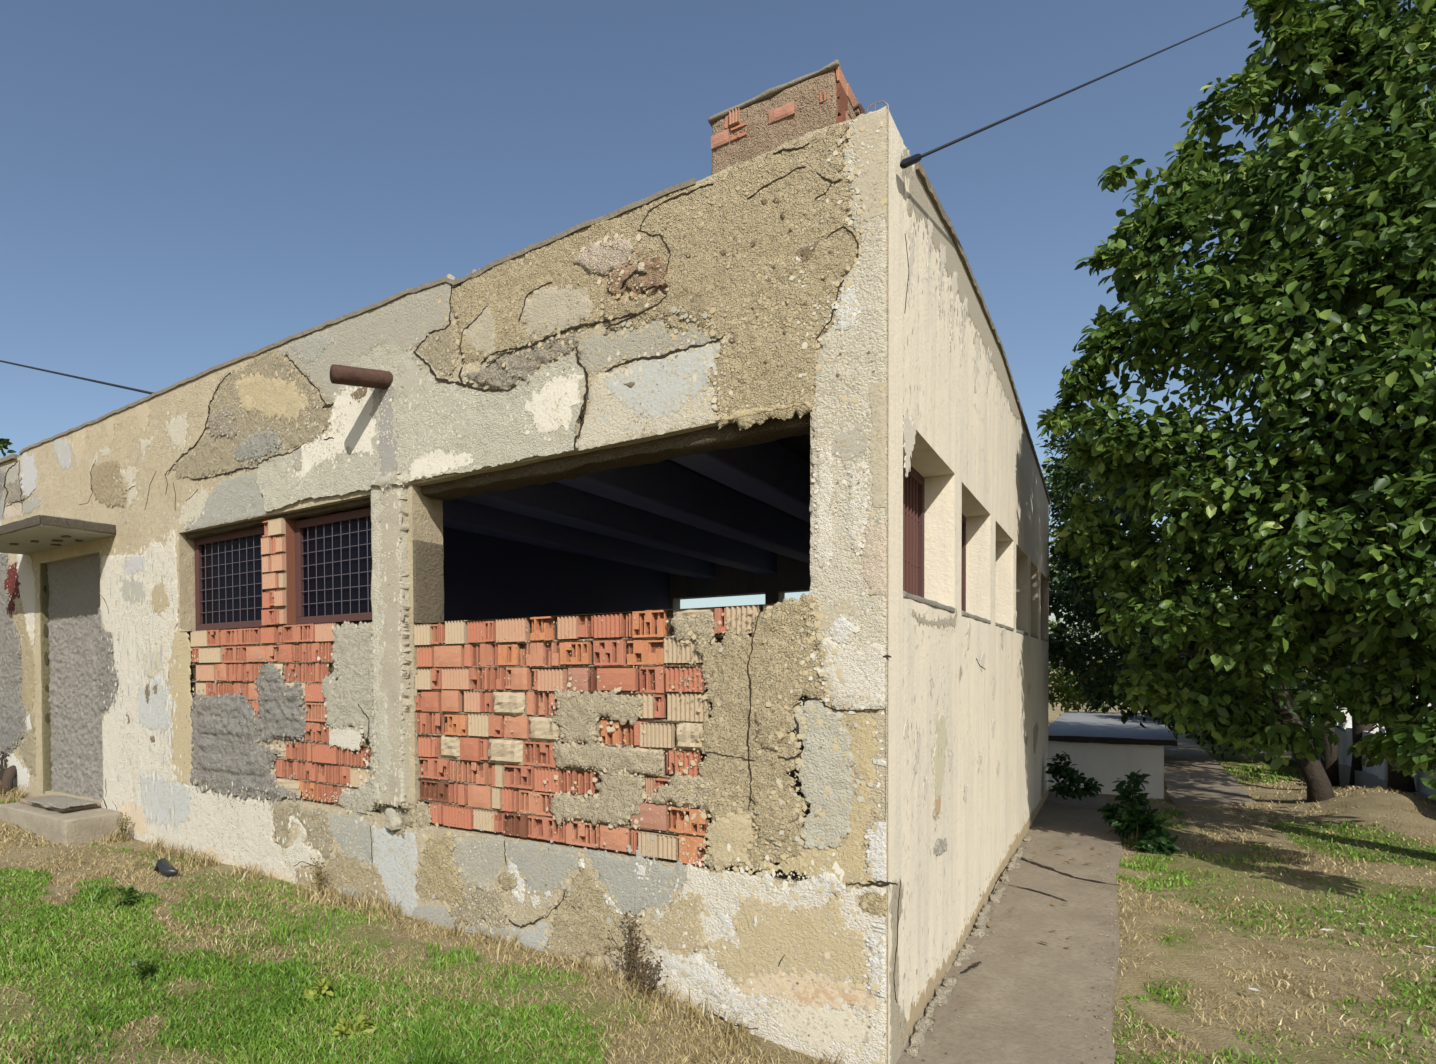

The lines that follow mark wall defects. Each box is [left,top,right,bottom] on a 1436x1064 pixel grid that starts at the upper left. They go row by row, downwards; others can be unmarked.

crack [413,183,725,449]
crack [747,142,842,199]
crack [816,226,859,339]
spalling [0,553,36,786]
spalling [90,66,1032,1064]
crack [705,610,879,810]